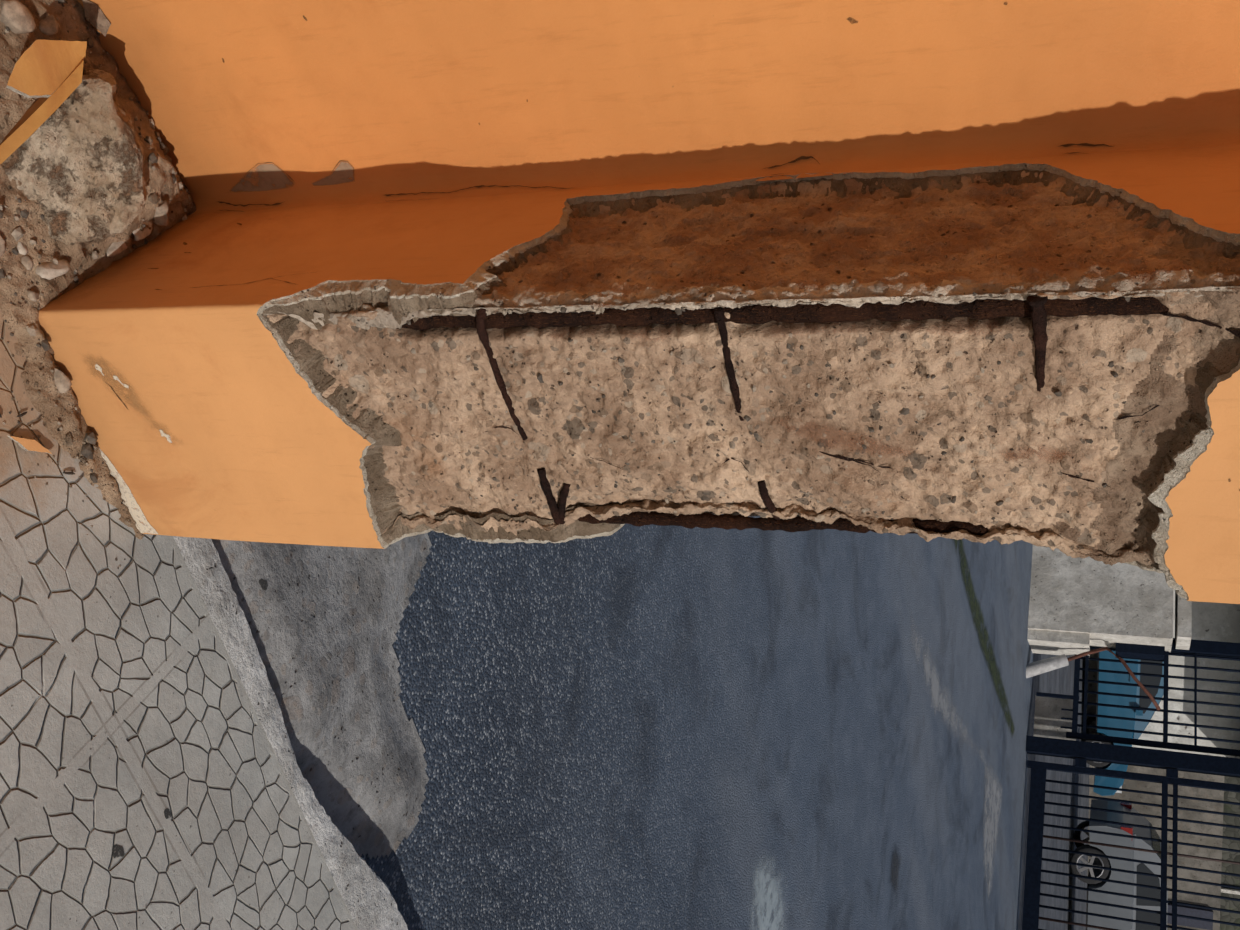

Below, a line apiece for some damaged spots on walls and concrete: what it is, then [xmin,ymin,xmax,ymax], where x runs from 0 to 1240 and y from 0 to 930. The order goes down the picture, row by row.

peeling [231,162,293,192]
spalling [257,161,1240,600]
spalling [99,448,158,534]